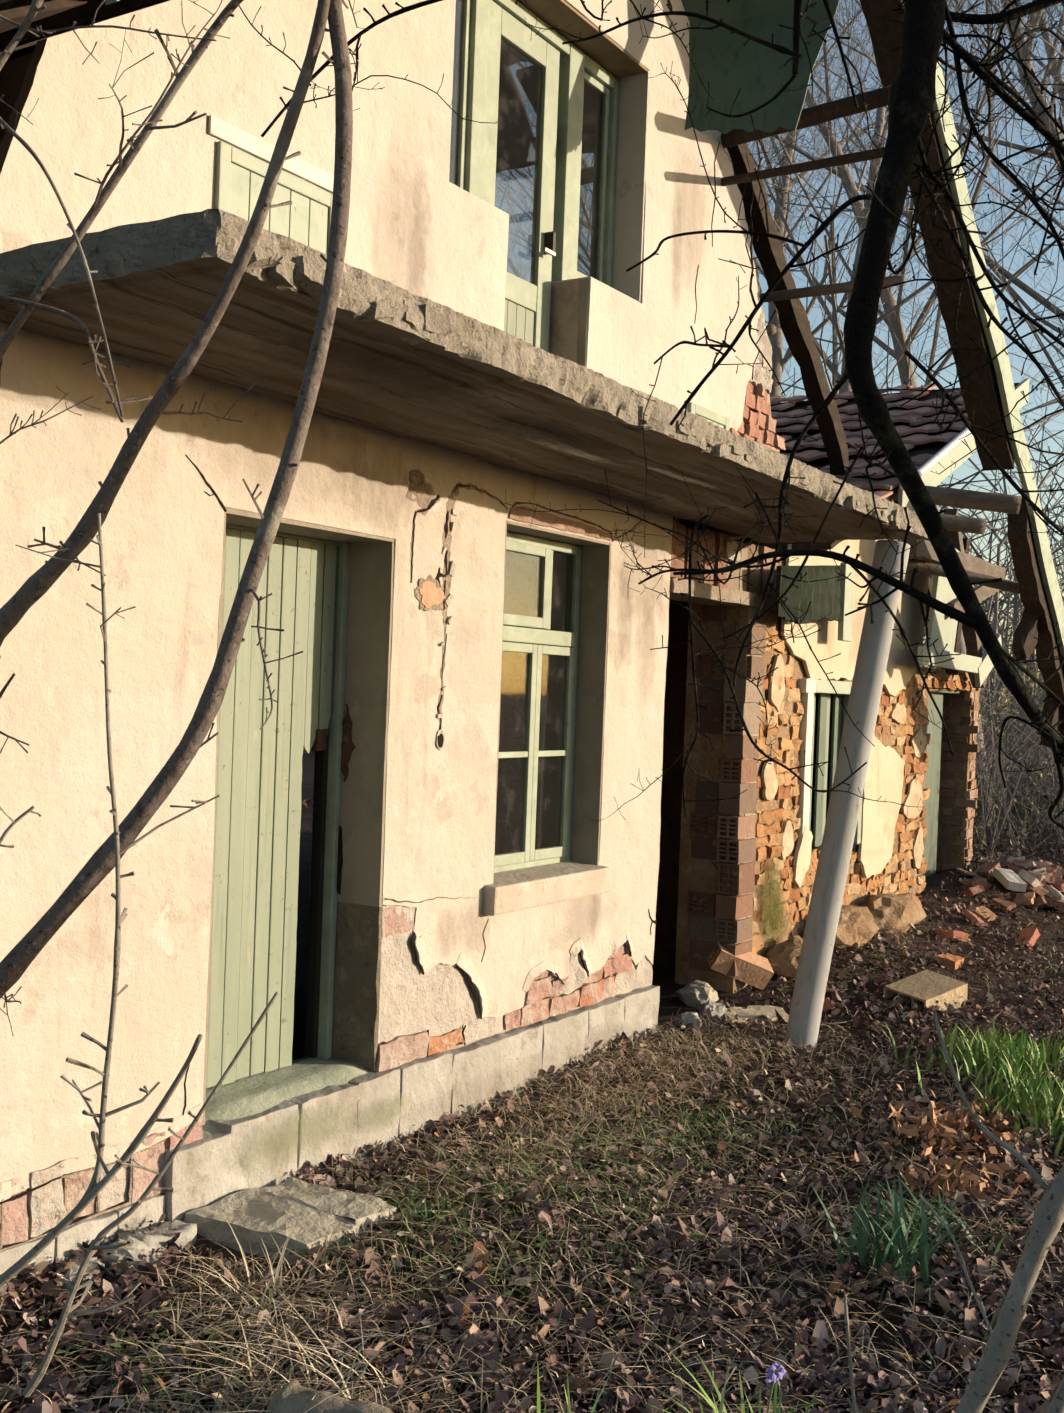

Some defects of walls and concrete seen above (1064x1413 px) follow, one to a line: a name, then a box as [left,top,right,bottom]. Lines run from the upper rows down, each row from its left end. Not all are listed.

flaking render [414,575,447,611]
crack [410,482,668,730]
spalling [332,826,653,1072]
spalling [0,1104,203,1252]